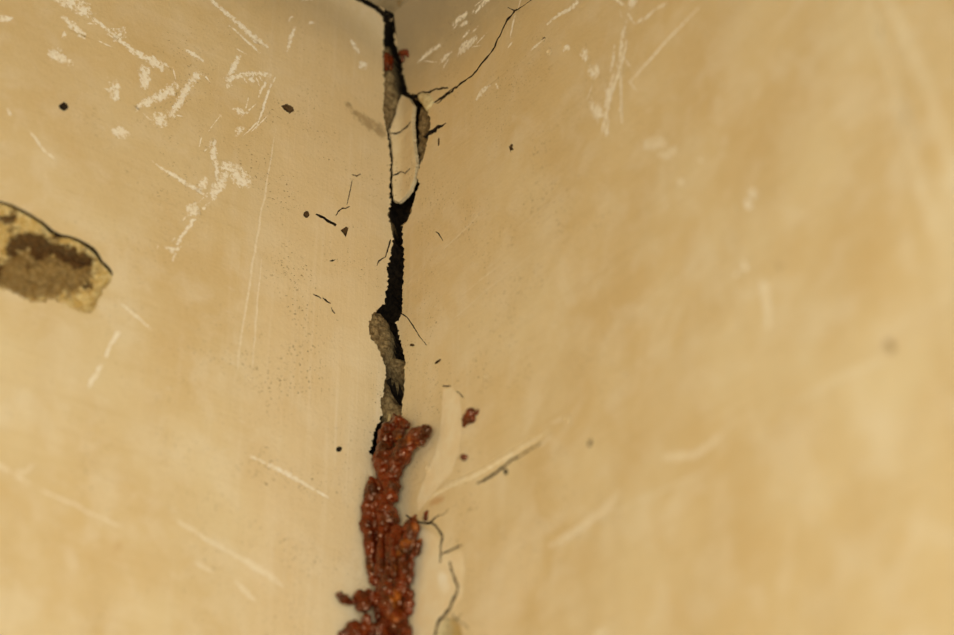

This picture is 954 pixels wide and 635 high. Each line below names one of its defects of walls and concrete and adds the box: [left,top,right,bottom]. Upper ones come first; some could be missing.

flaking render [0,201,113,313]
crack [336,174,361,215]
crack [356,0,531,456]
crack [406,510,469,635]